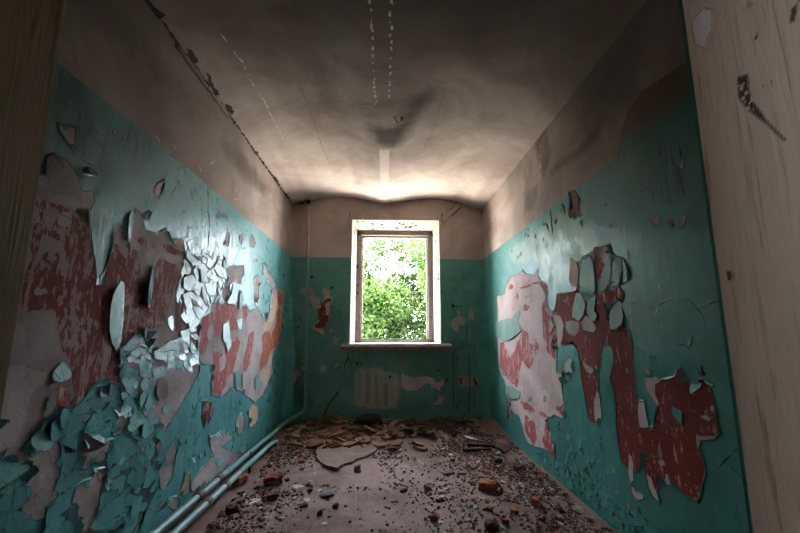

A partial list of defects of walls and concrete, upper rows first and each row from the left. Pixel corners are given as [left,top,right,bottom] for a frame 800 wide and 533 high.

flaking render [175,43,236,125]
peeling [0,121,285,533]
peeling [299,286,334,335]
peeling [400,373,448,392]
peeling [495,243,722,533]